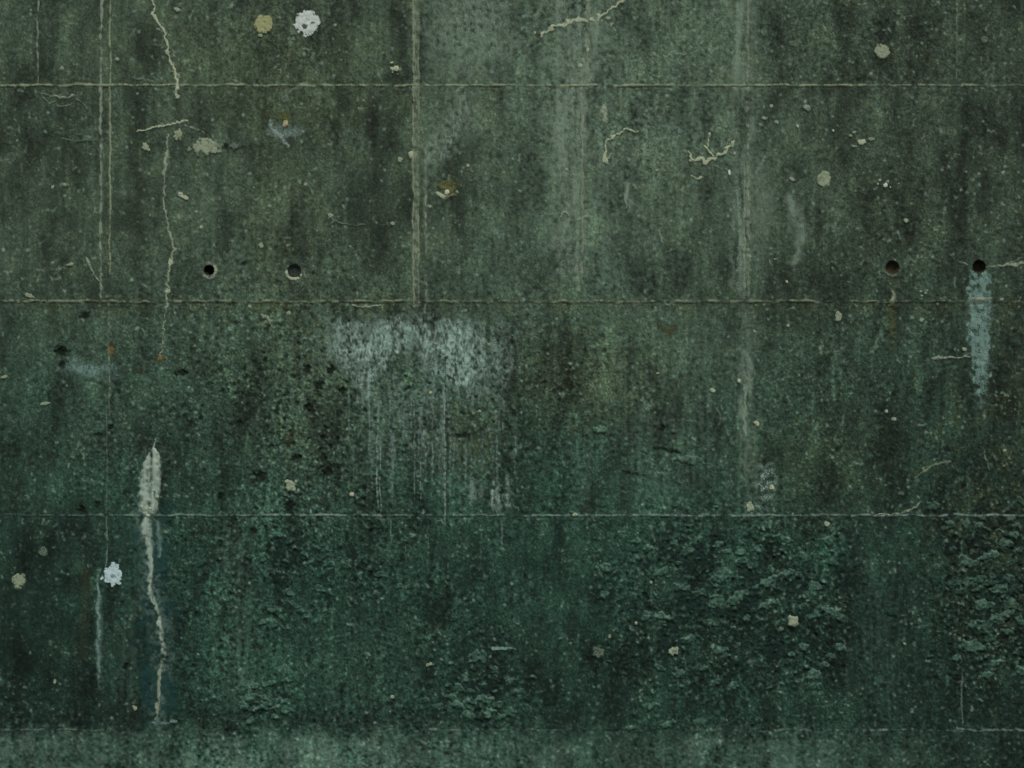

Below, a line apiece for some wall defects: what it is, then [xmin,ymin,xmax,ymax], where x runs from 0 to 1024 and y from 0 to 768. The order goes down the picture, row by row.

crack [534,0,625,83]
crack [133,0,203,355]
crack [688,132,736,179]
damp [329,317,499,516]
damp [966,270,992,399]
damp [131,439,180,724]